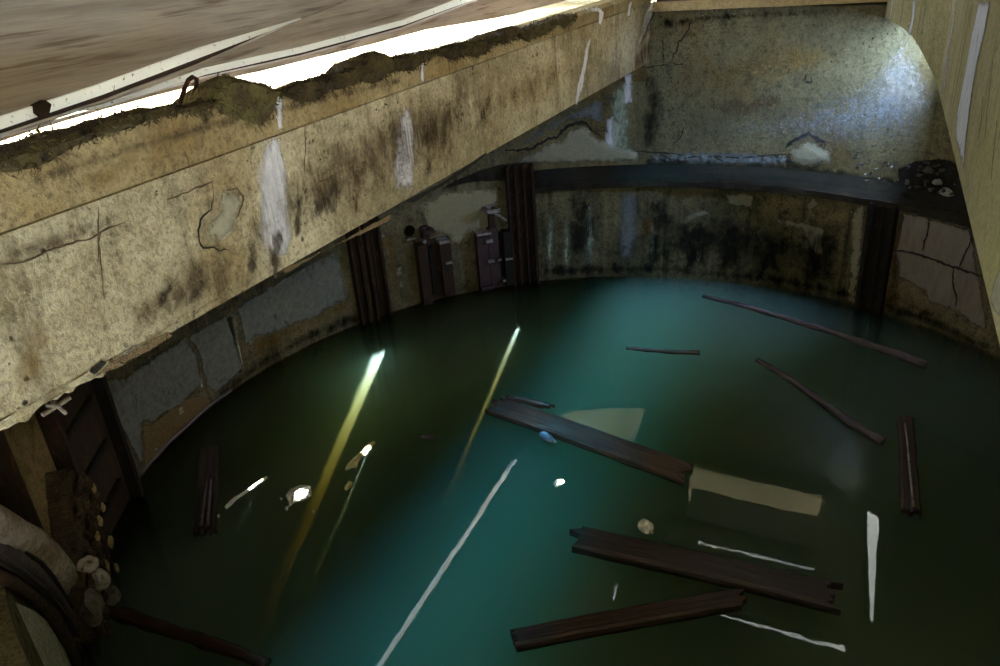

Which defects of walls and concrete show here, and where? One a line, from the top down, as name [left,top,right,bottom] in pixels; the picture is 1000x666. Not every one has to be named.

efflorescence [575,39,591,104]
crack [643,23,691,68]
crack [6,206,125,300]
crack [167,149,244,251]
damp [260,139,302,279]
damp [315,180,338,214]
flaking render [402,102,637,204]
crack [505,120,608,152]
damp [544,194,864,302]
crack [892,219,982,307]